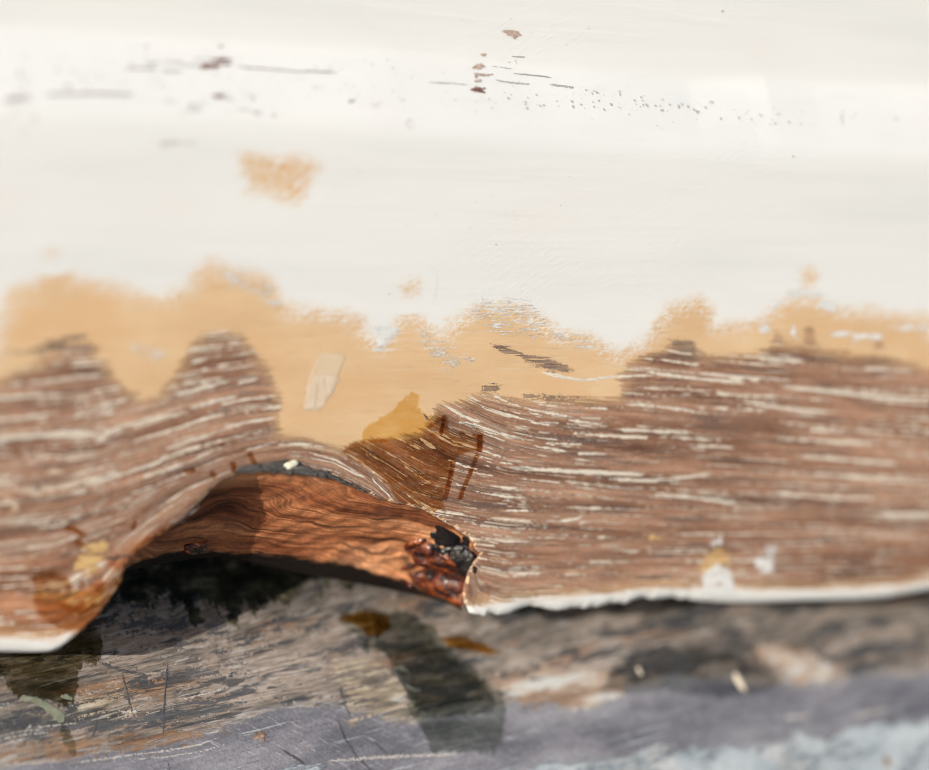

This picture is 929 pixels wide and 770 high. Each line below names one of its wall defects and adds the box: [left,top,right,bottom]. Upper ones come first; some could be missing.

peeling [213,114,344,230]
peeling [0,237,929,770]